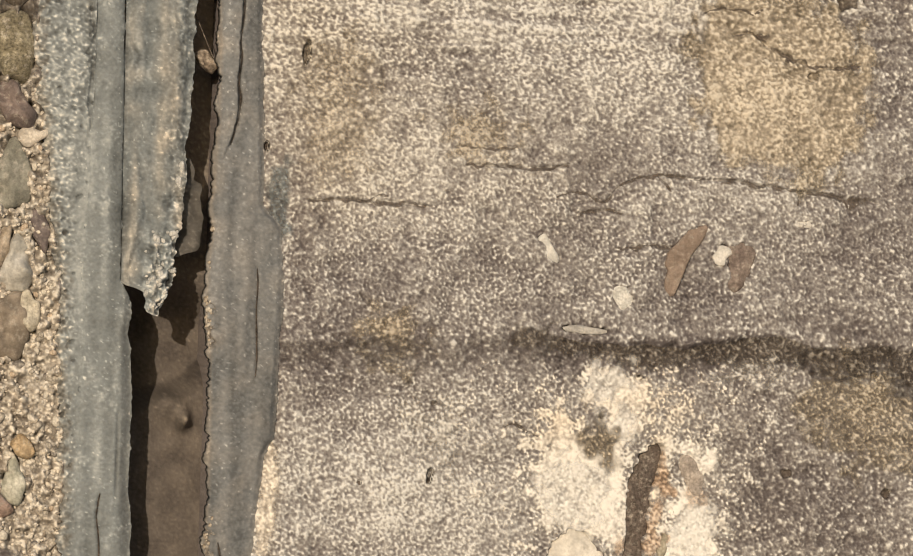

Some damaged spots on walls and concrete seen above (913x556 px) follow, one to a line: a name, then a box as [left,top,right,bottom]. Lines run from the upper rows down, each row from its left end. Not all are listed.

spalling [837,0,864,11]
crack [705,7,859,72]
crack [230,0,246,145]
damp [680,0,877,197]
peeling [175,161,185,188]
crack [462,146,568,171]
crack [557,173,700,216]
crack [723,179,867,210]
damp [398,393,508,502]
damp [483,323,913,556]